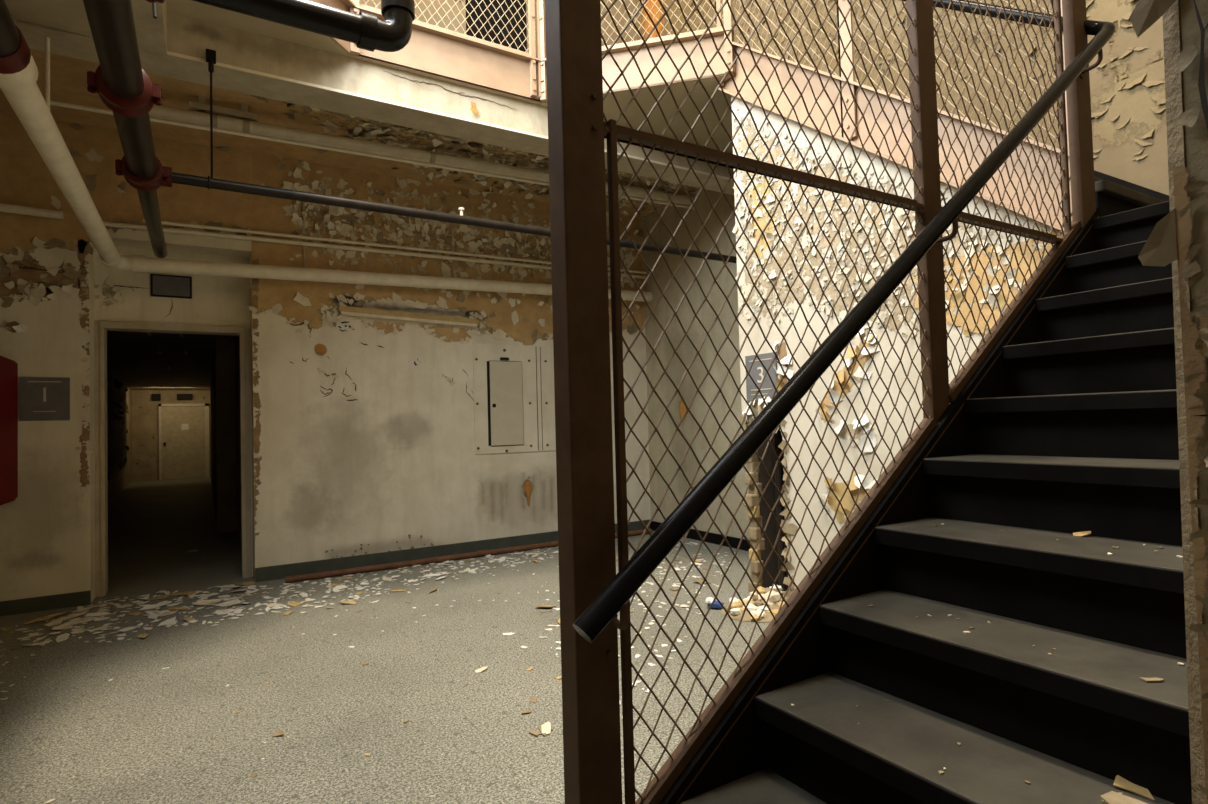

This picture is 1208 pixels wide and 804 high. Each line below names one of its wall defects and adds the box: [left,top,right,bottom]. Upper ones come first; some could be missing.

peeling [0,88,130,506]
peeling [30,49,146,233]
peeling [147,73,553,536]
peeling [605,168,701,335]
peeling [740,341,794,433]
peeling [732,108,916,326]
peeling [815,266,920,452]
peeling [943,210,1062,336]
peeling [1086,0,1200,161]
peeling [1138,164,1208,804]